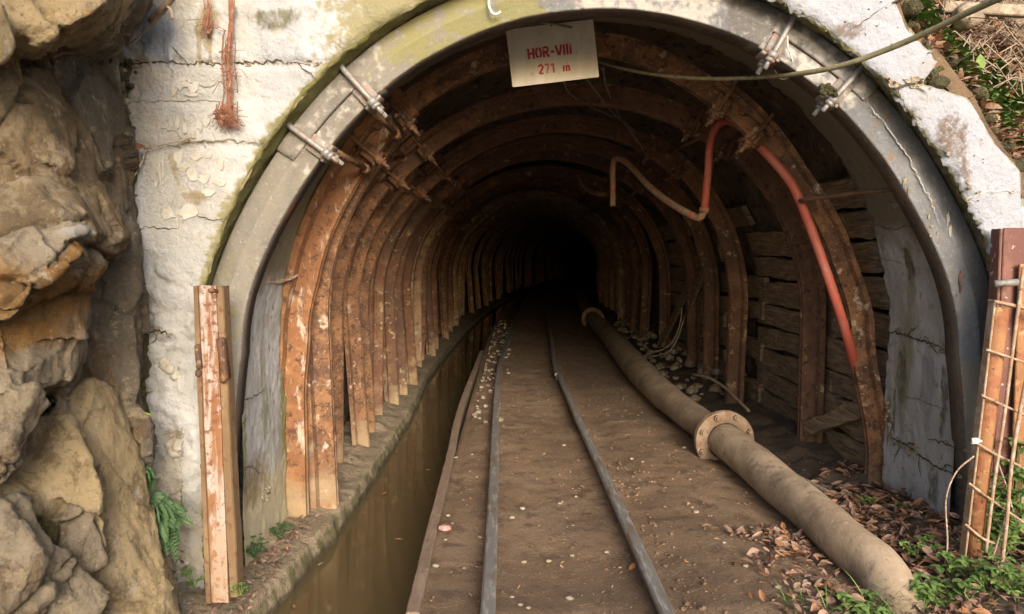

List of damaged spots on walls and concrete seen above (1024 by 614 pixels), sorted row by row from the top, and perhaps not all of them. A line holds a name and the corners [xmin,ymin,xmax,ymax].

peeling [171,77,199,97]
crack [131,45,319,103]
crack [139,128,260,164]
peeling [154,150,226,197]
peeling [162,204,199,228]
crack [884,326,945,357]
crack [888,417,966,482]